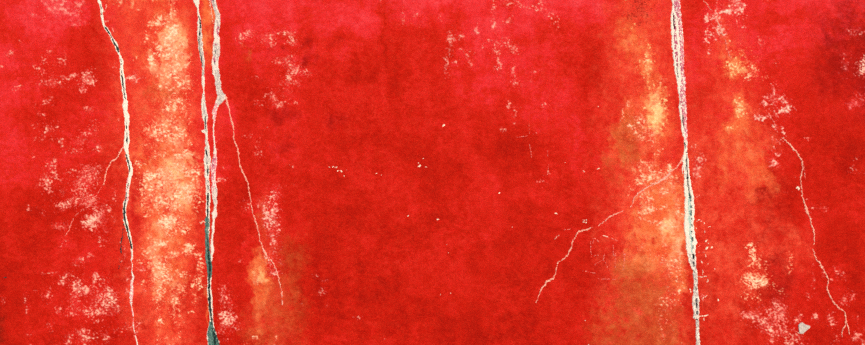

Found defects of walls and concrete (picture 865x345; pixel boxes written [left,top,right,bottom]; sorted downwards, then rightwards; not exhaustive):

crack [61,0,140,345]
rust [85,0,234,345]
crack [193,0,283,345]
crack [535,0,707,345]
rust [579,0,822,345]
peeling [734,240,865,345]
crack [762,102,850,335]